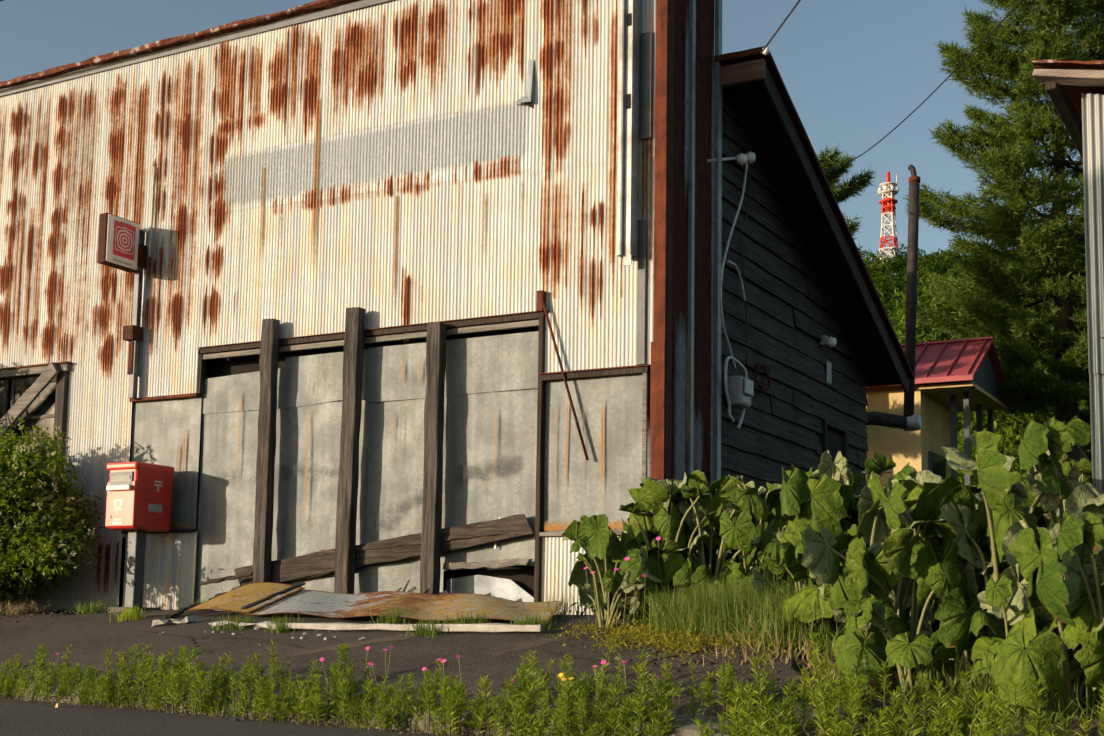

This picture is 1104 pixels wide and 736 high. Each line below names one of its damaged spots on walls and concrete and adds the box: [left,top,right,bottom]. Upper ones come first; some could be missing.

corrosion [0,0,622,379]